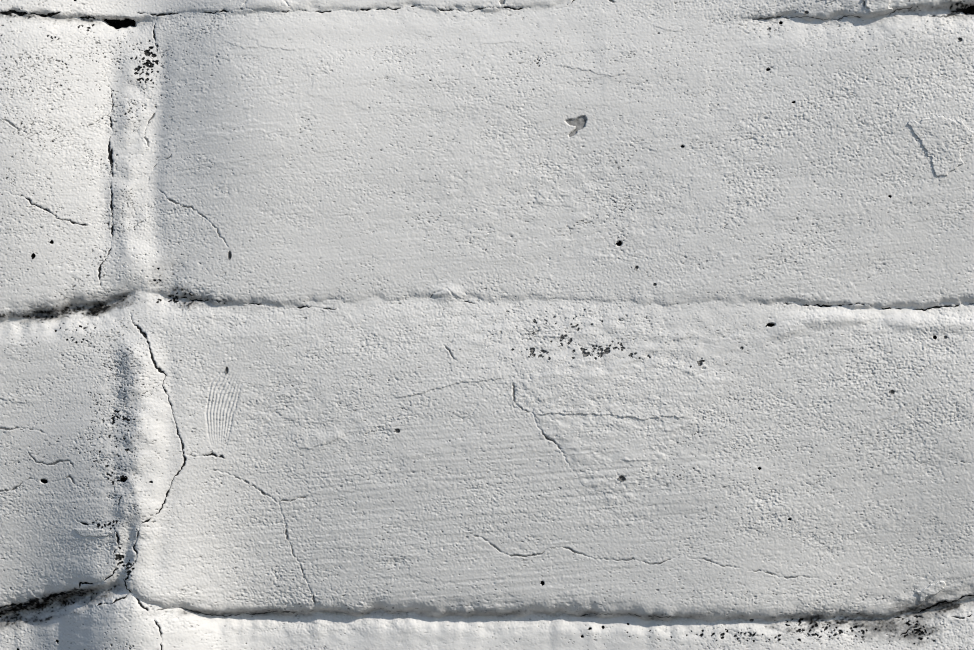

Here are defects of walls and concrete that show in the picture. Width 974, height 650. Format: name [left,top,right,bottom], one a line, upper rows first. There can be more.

crack [137,12,178,54]
peeling [566,116,587,137]
crack [21,195,86,225]
crack [0,317,315,650]